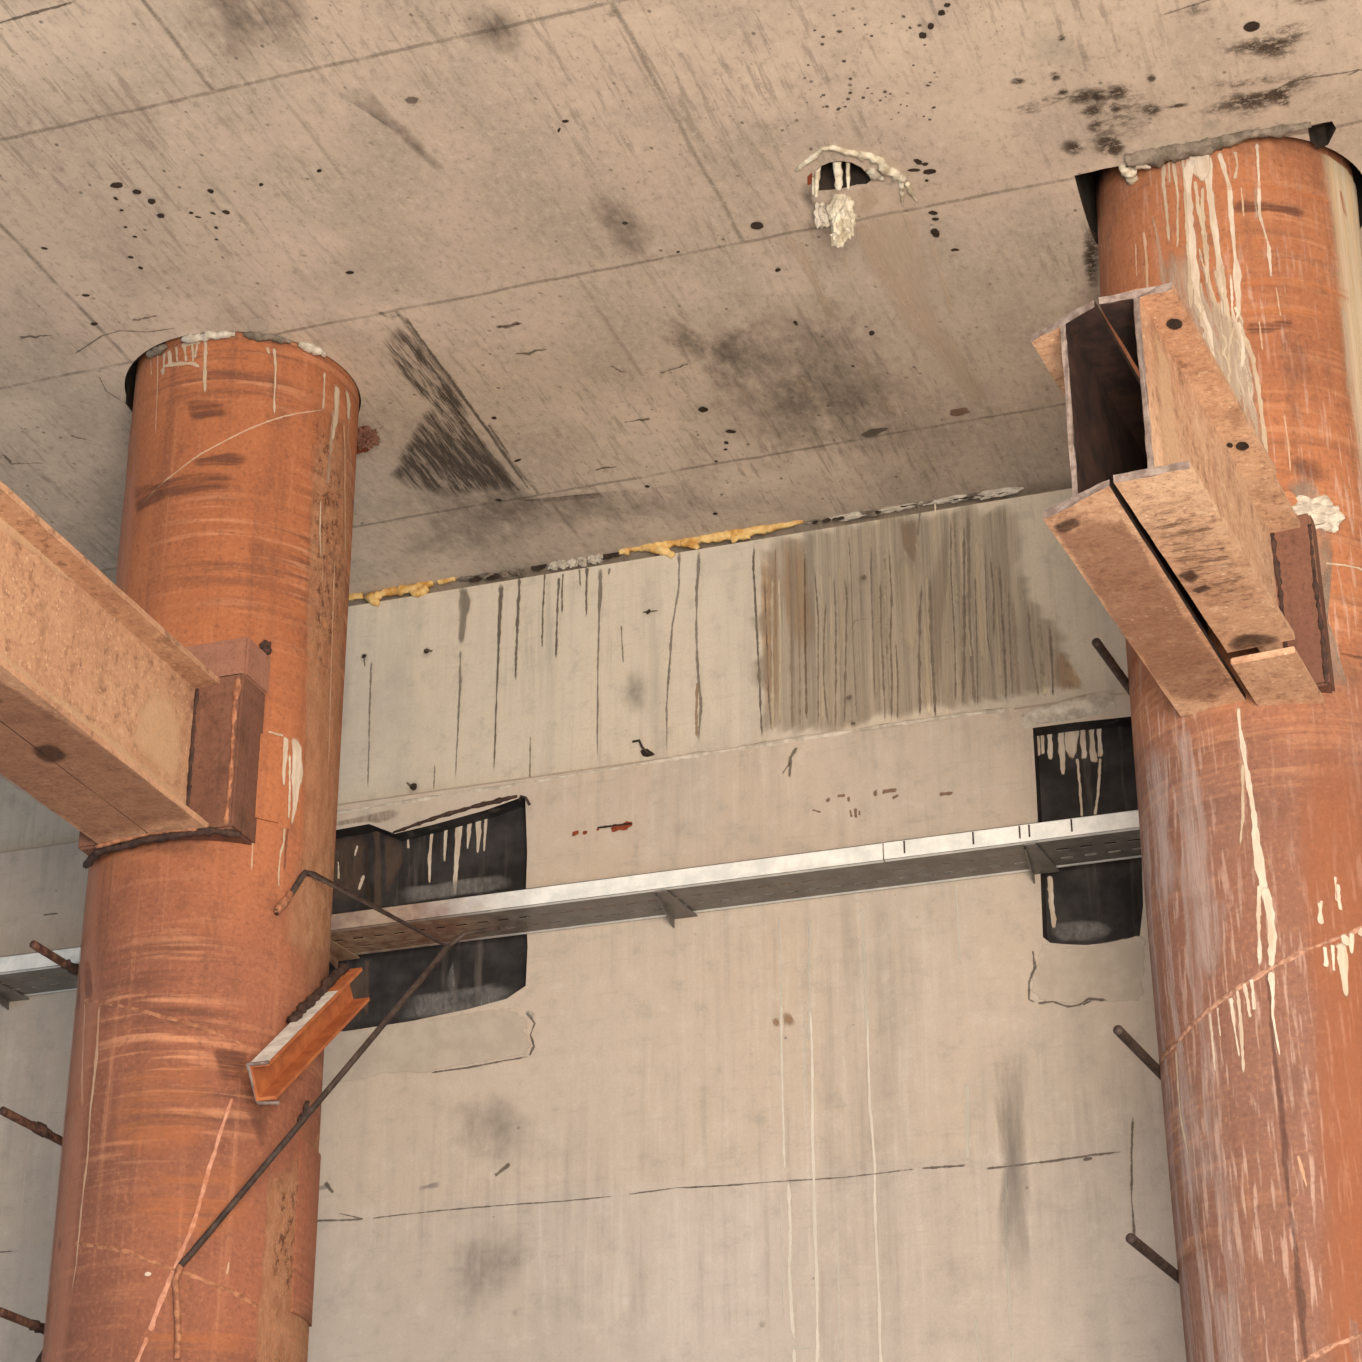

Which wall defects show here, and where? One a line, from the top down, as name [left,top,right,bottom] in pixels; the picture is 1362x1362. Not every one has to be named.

mould [1043,73,1186,155]
leakage [1218,79,1298,110]
leakage [1235,21,1297,56]
rust [1236,204,1300,215]
rust [317,437,341,672]
leakage [455,589,470,767]
leakage [494,579,521,763]
leakage [541,568,610,751]
leakage [665,554,702,738]
leakage [752,504,1079,731]
crack [1028,951,1104,1008]
rust [276,1186,298,1292]